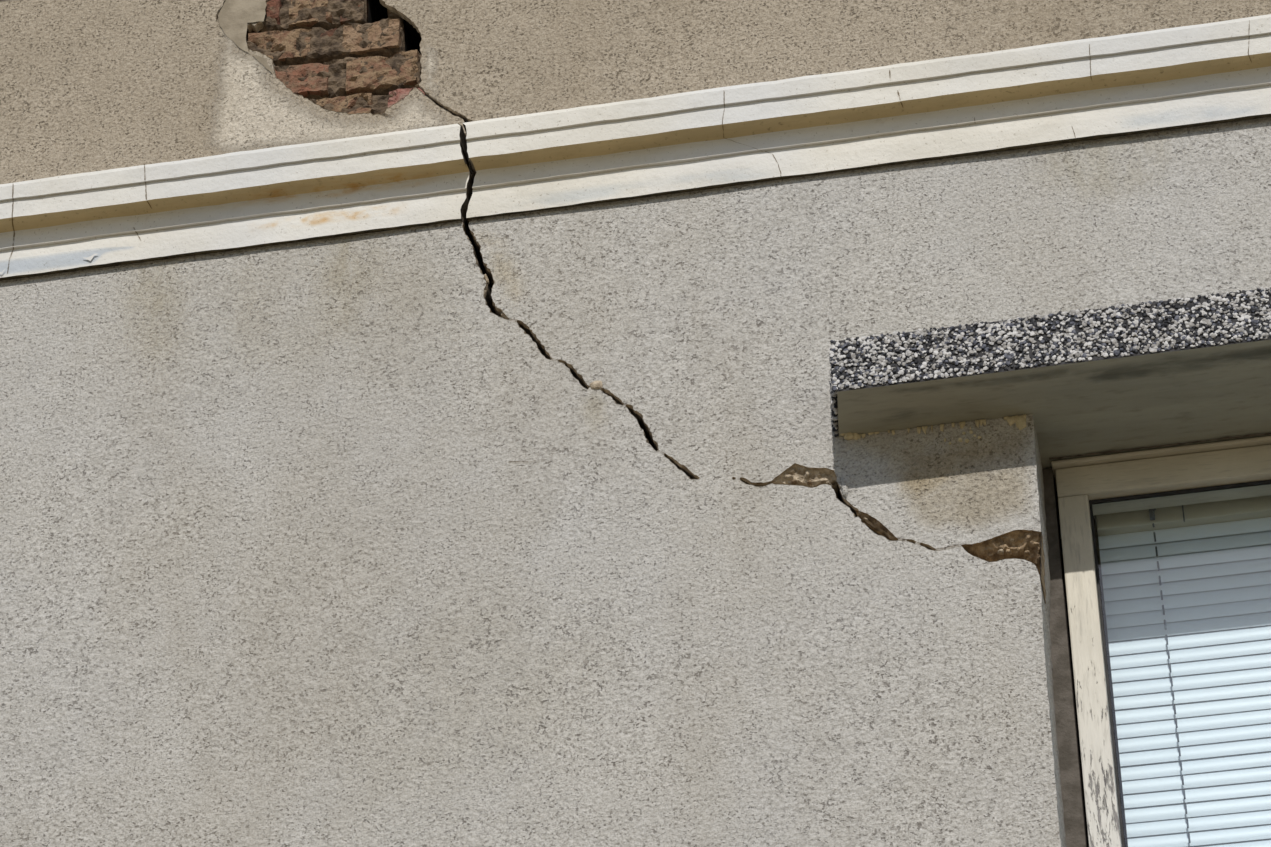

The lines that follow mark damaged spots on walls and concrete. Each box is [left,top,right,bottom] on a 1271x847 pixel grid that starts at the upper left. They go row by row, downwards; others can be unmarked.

flaking render [218,0,426,118]
crack [415,84,700,479]
crack [732,477,776,487]
crack [831,481,959,550]